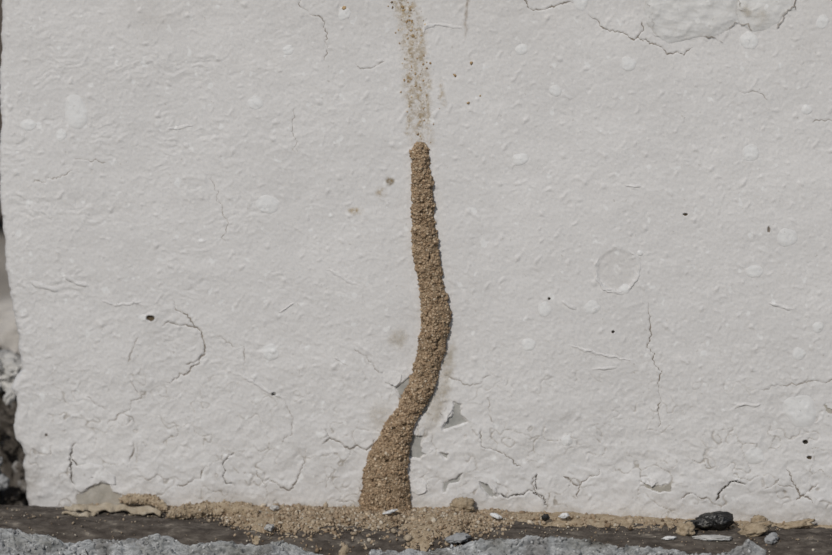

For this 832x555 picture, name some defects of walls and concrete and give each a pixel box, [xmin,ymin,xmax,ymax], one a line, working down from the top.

crack [590,16,693,55]
crack [163,309,245,383]
crack [647,305,662,426]
crack [761,379,832,390]
spalling [438,402,467,429]
crack [322,431,375,451]
spalling [409,435,448,458]
crack [445,375,549,507]
crack [138,454,233,487]
crack [256,459,305,491]
crack [681,480,745,500]
crack [765,469,816,503]